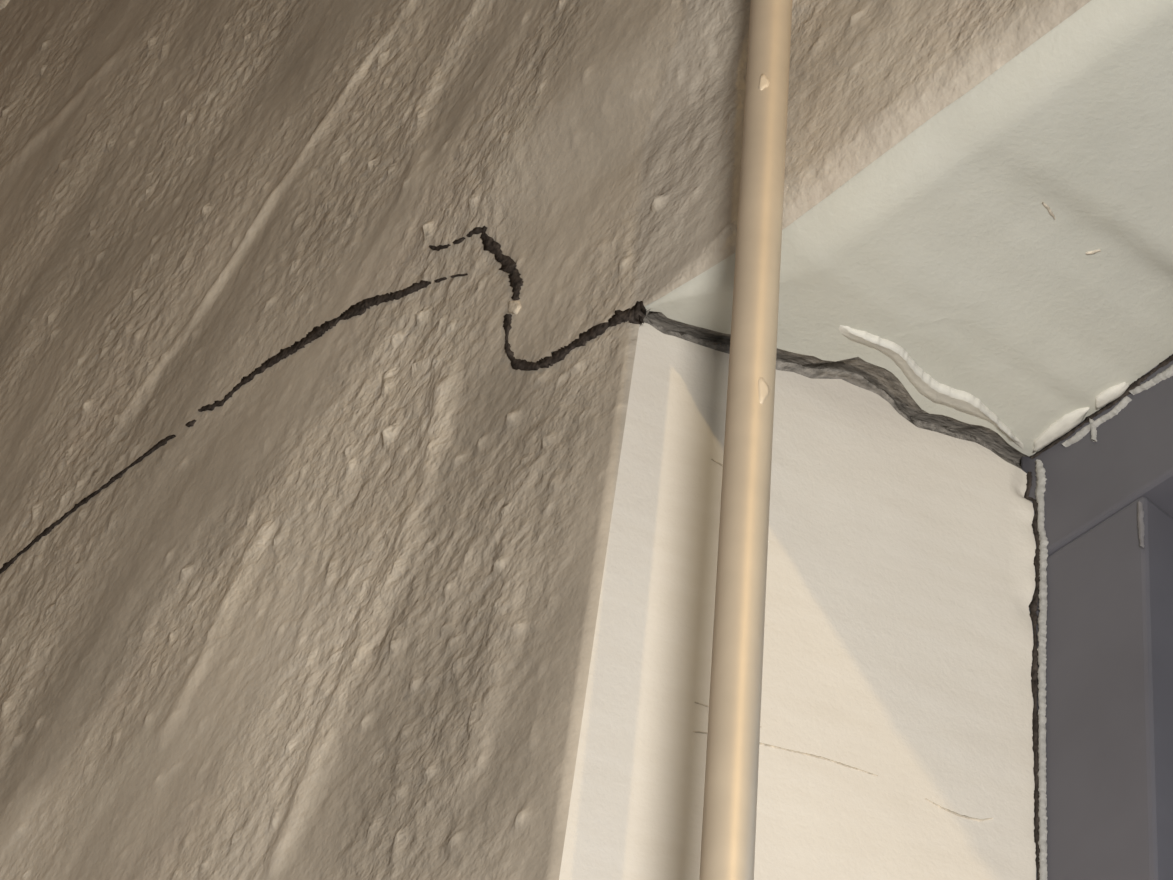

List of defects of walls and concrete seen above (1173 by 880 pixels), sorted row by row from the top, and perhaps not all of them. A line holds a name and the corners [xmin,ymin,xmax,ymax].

crack [0,226,731,574]
peeling [839,325,1129,452]
crack [759,348,1173,880]